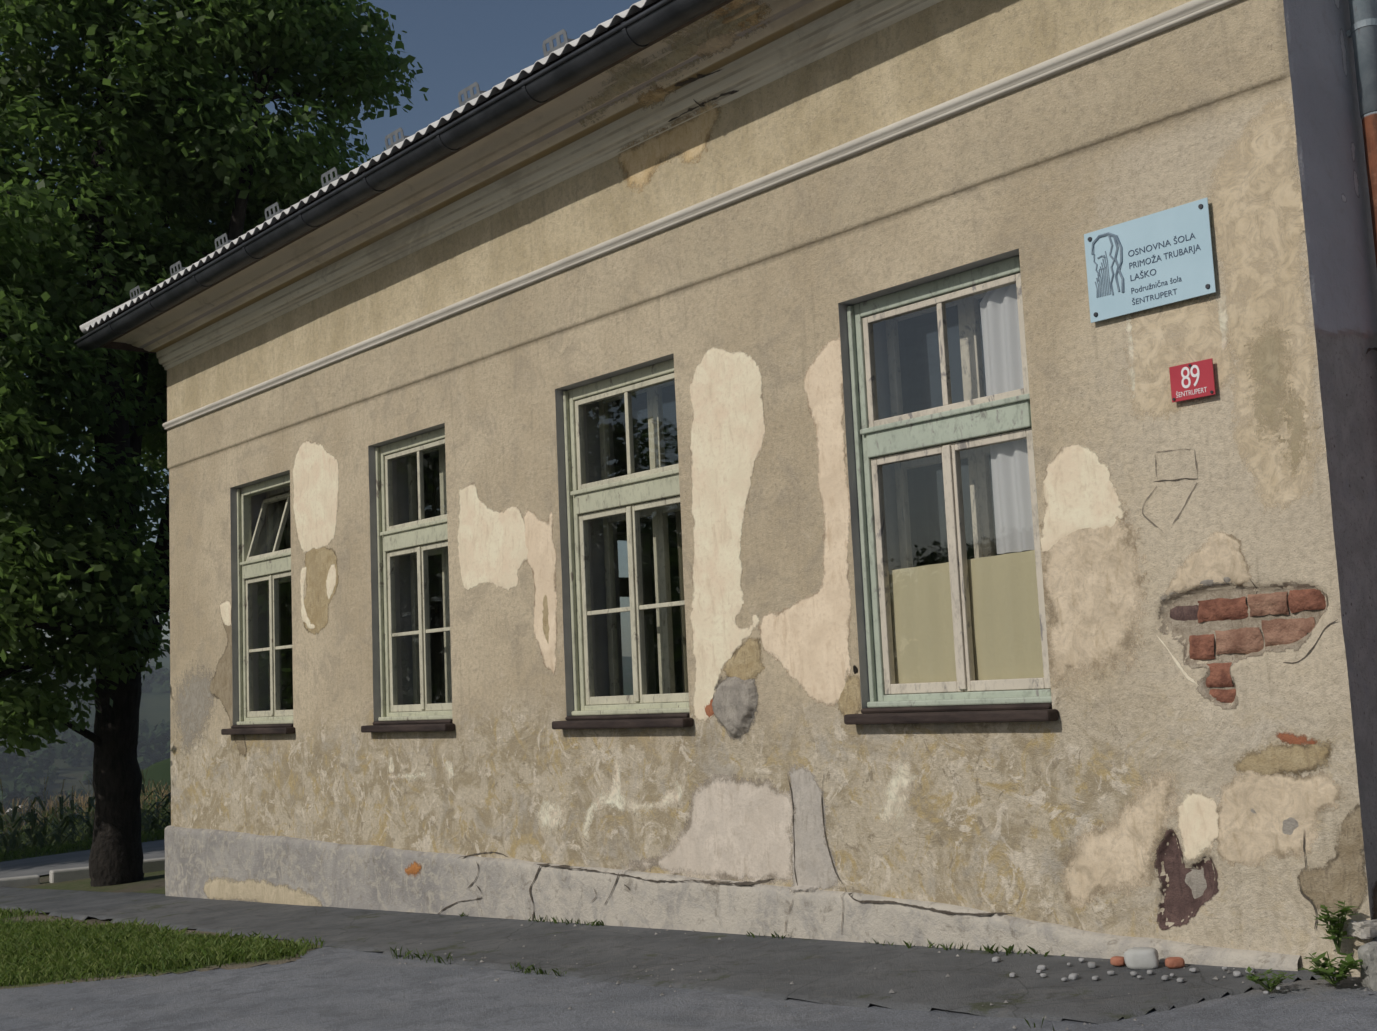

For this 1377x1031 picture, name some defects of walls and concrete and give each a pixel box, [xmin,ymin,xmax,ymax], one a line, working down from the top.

peeling [618,102,721,191]
peeling [292,440,339,635]
peeling [457,482,558,675]
peeling [689,334,861,723]
peeling [1039,444,1338,710]
peeling [622,774,795,886]
crack [438,775,1011,932]
peeling [1062,732,1377,930]